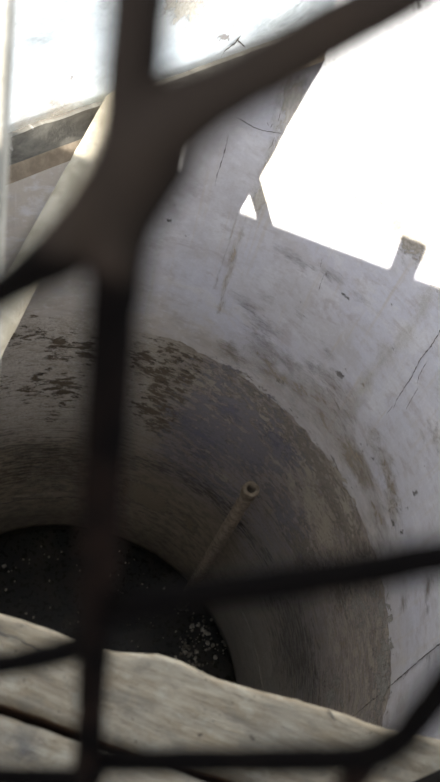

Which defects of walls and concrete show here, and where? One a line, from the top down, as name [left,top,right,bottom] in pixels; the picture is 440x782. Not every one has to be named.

crack [387,330,440,413]